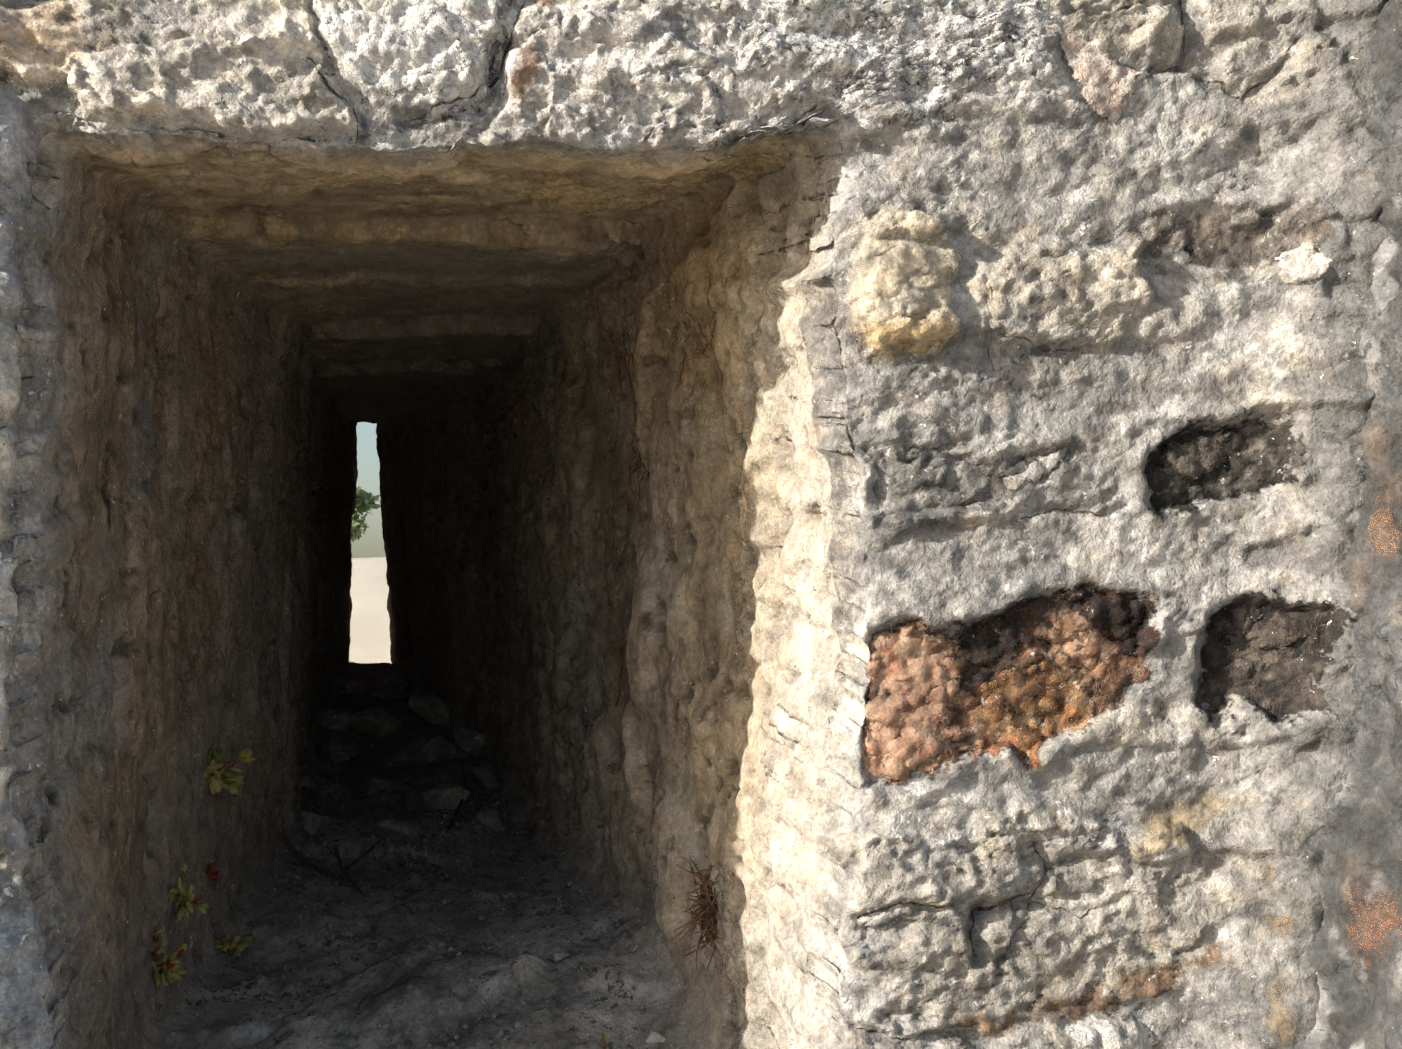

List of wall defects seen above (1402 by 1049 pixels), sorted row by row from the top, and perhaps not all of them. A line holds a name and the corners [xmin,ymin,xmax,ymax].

crack [405,0,526,122]
spalling [1144,408,1306,528]
spalling [861,582,1160,785]
spalling [1194,588,1357,727]
crack [857,840,1110,976]